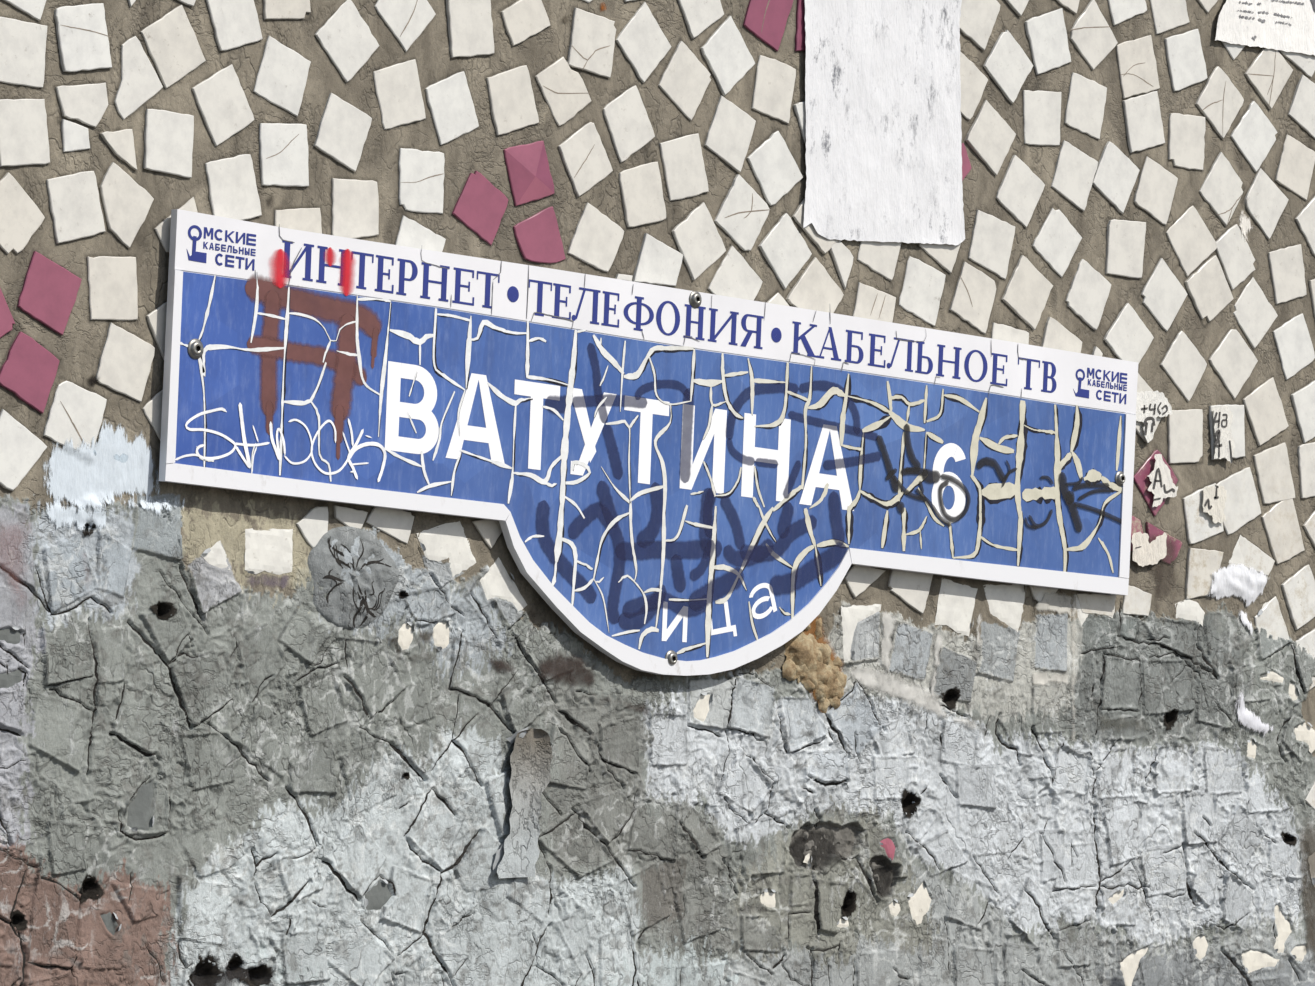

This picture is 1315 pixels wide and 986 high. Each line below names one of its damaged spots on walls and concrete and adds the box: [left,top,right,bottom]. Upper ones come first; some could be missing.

crack [0,551,737,986]
crack [689,673,884,828]
crack [746,857,875,986]
spalling [796,826,853,868]
crack [905,832,939,869]
crack [921,601,1305,986]